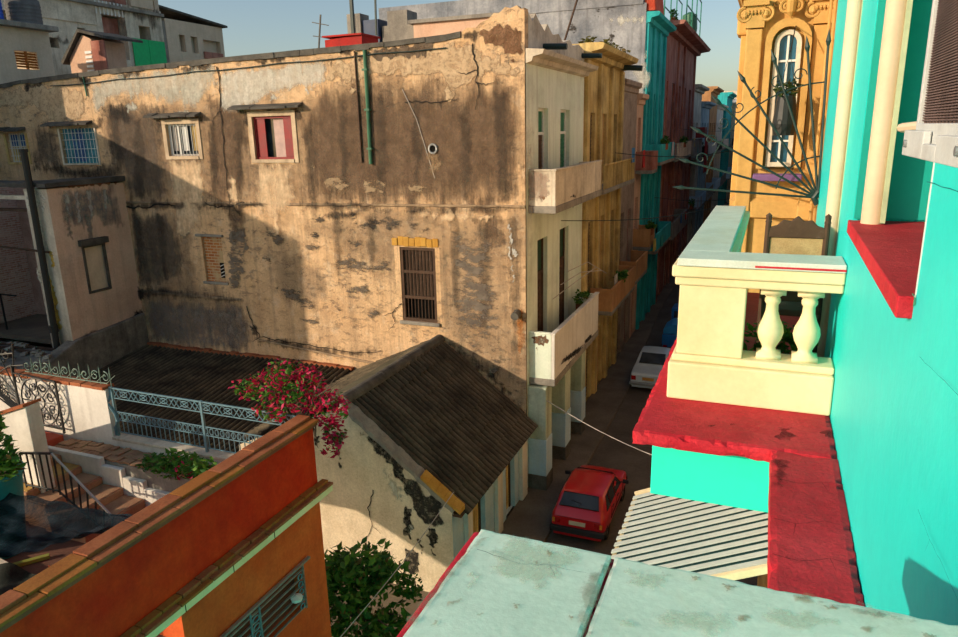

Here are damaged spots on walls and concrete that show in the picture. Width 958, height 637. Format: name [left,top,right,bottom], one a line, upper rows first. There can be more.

damp [181,64,211,74]
peeling [0,24,523,122]
crack [405,43,494,110]
damp [34,101,295,351]
crack [126,67,263,219]
damp [295,83,518,394]
damp [528,173,549,199]
damp [268,338,369,356]